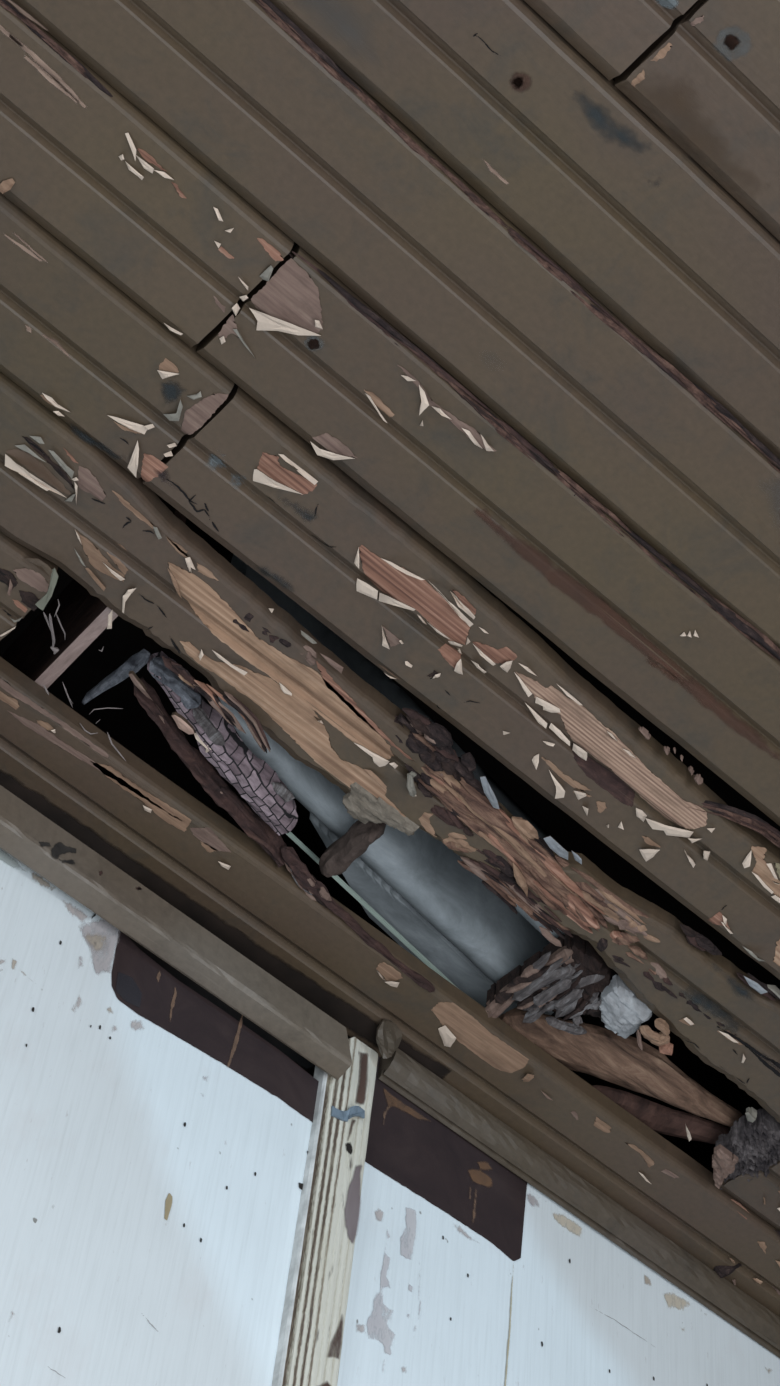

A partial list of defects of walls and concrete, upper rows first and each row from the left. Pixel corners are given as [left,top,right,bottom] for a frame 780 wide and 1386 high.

peeling [118,132,186,198]
peeling [214,238,323,359]
peeling [108,391,229,482]
peeling [364,390,394,423]
peeling [398,365,496,452]
peeling [354,545,715,868]
peeling [742,846,780,903]
peeling [709,912,780,966]
peeling [66,903,319,1122]
peeling [431,1002,553,1100]
peeling [744,976,768,994]
peeling [328,1053,538,1358]